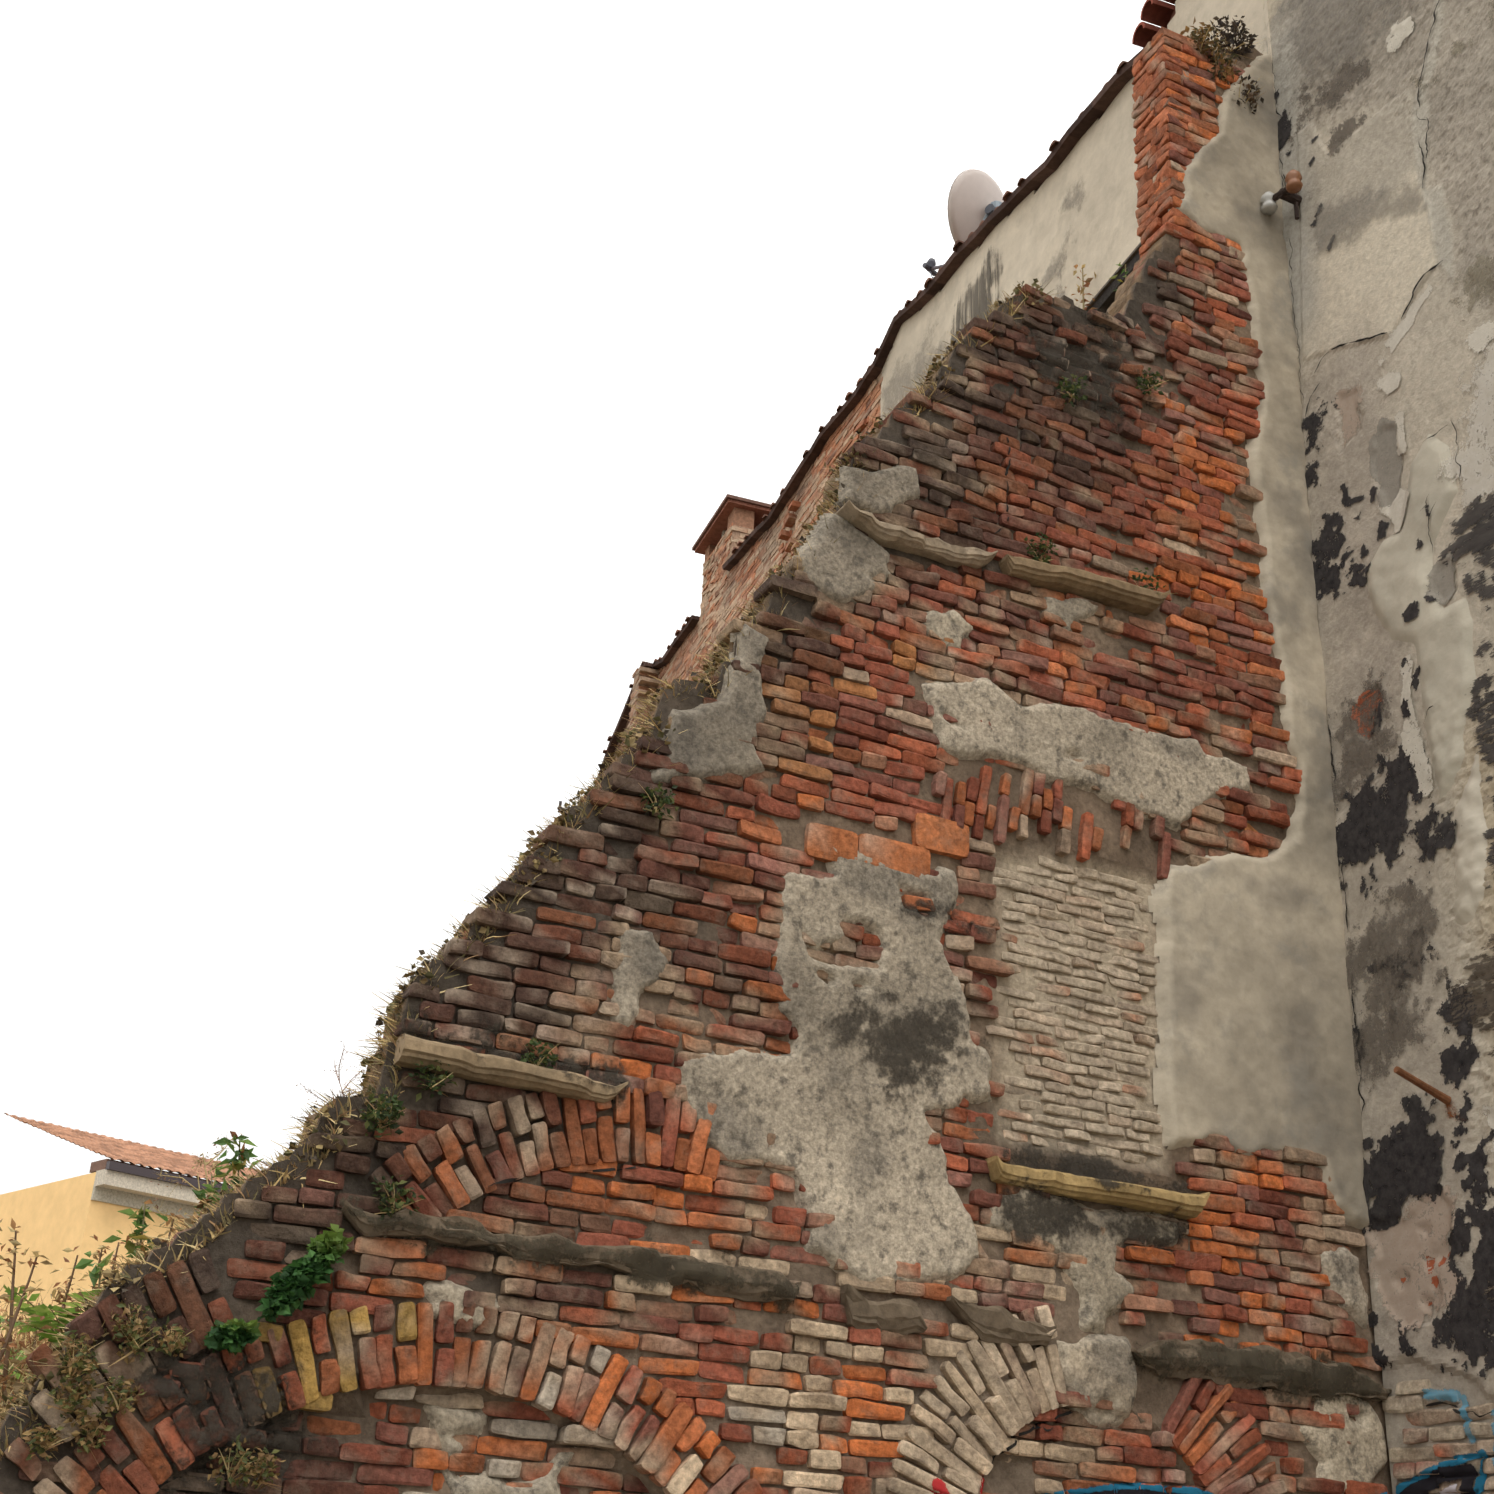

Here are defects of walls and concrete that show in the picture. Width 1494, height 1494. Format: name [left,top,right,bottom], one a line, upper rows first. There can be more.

crack [1416,0,1440,188]
water stain [946,251,1003,354]
crack [1289,239,1443,417]
flaking render [792,465,920,604]
flaking render [649,624,769,784]
flaking render [922,609,973,650]
flaking render [1041,597,1098,631]
flaking render [921,678,1250,832]
flaking render [1148,51,1494,1380]
flaking render [610,928,669,1027]
flaking render [675,847,1179,1431]
flaking render [1293,1394,1387,1491]